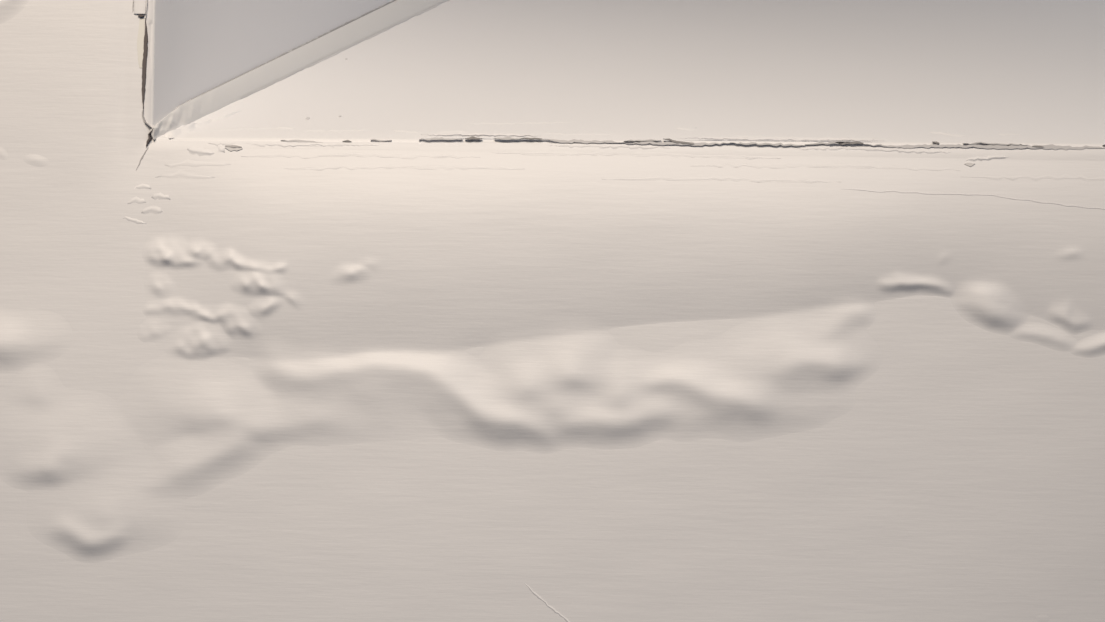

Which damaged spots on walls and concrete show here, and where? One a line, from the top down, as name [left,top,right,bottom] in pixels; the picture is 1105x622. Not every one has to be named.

crack [136,0,153,170]
crack [174,0,449,110]
crack [208,139,392,148]
crack [419,133,1103,167]